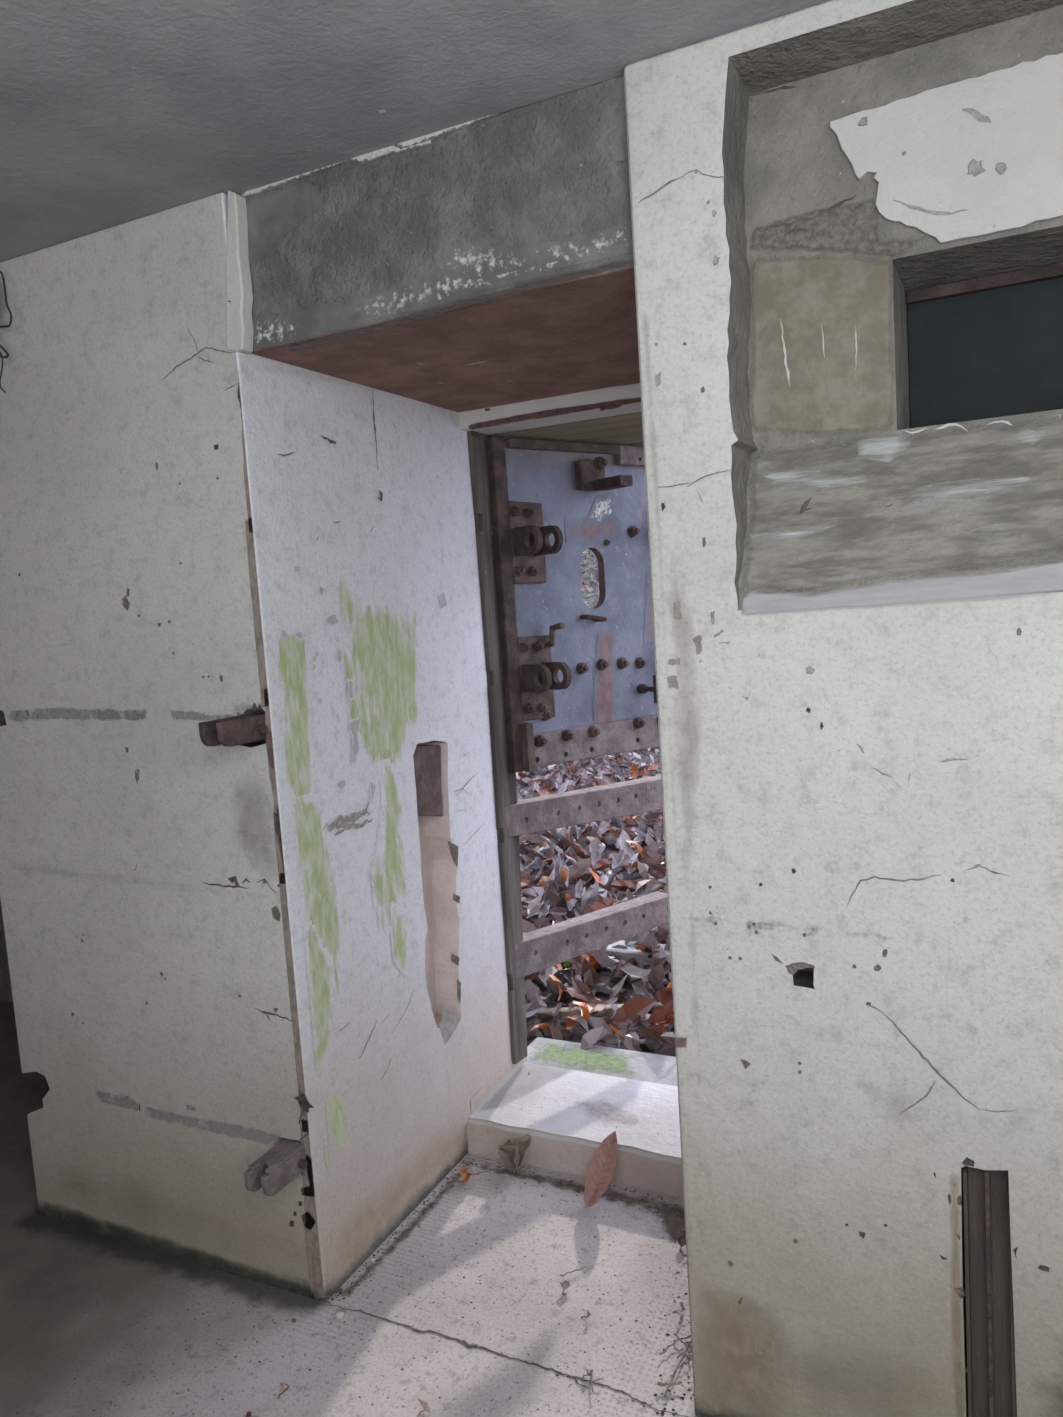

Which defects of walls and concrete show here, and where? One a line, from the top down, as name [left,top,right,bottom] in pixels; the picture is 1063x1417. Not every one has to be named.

spalling [968,159,1007,177]
damp [349,222,633,322]
crack [161,330,243,423]
damp [252,315,302,349]
rust [643,572,654,644]
rust [592,629,617,725]
spalling [448,841,458,867]
crack [847,864,1008,906]
spalling [440,954,461,1045]
spalling [772,954,815,975]
crack [868,1004,1005,1112]
crack [316,1300,688,1417]